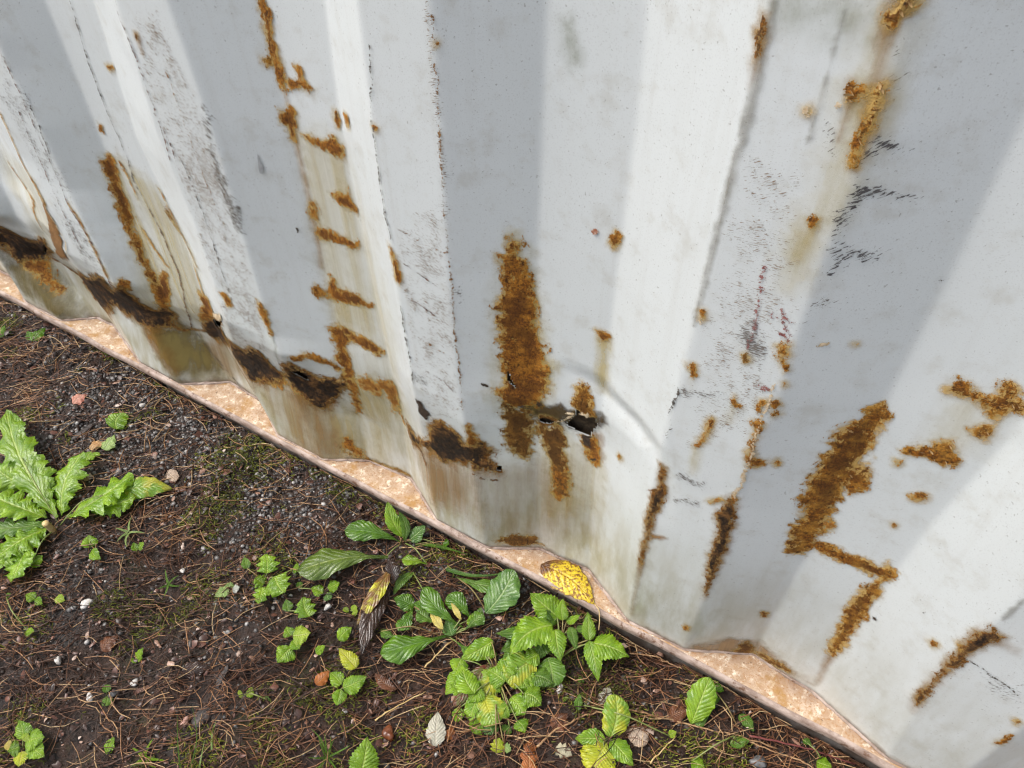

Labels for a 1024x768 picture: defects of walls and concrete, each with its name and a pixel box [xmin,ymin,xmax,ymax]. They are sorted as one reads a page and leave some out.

corrosion [880,0,923,31]
corrosion [256,0,349,160]
corrosion [843,80,890,169]
corrosion [0,114,604,502]
corrosion [570,329,612,417]
corrosion [942,375,1024,441]
corrosion [637,463,668,565]
corrosion [704,341,792,598]
corrosion [783,400,898,662]
corrosion [894,438,964,470]
corrosion [912,624,1009,706]